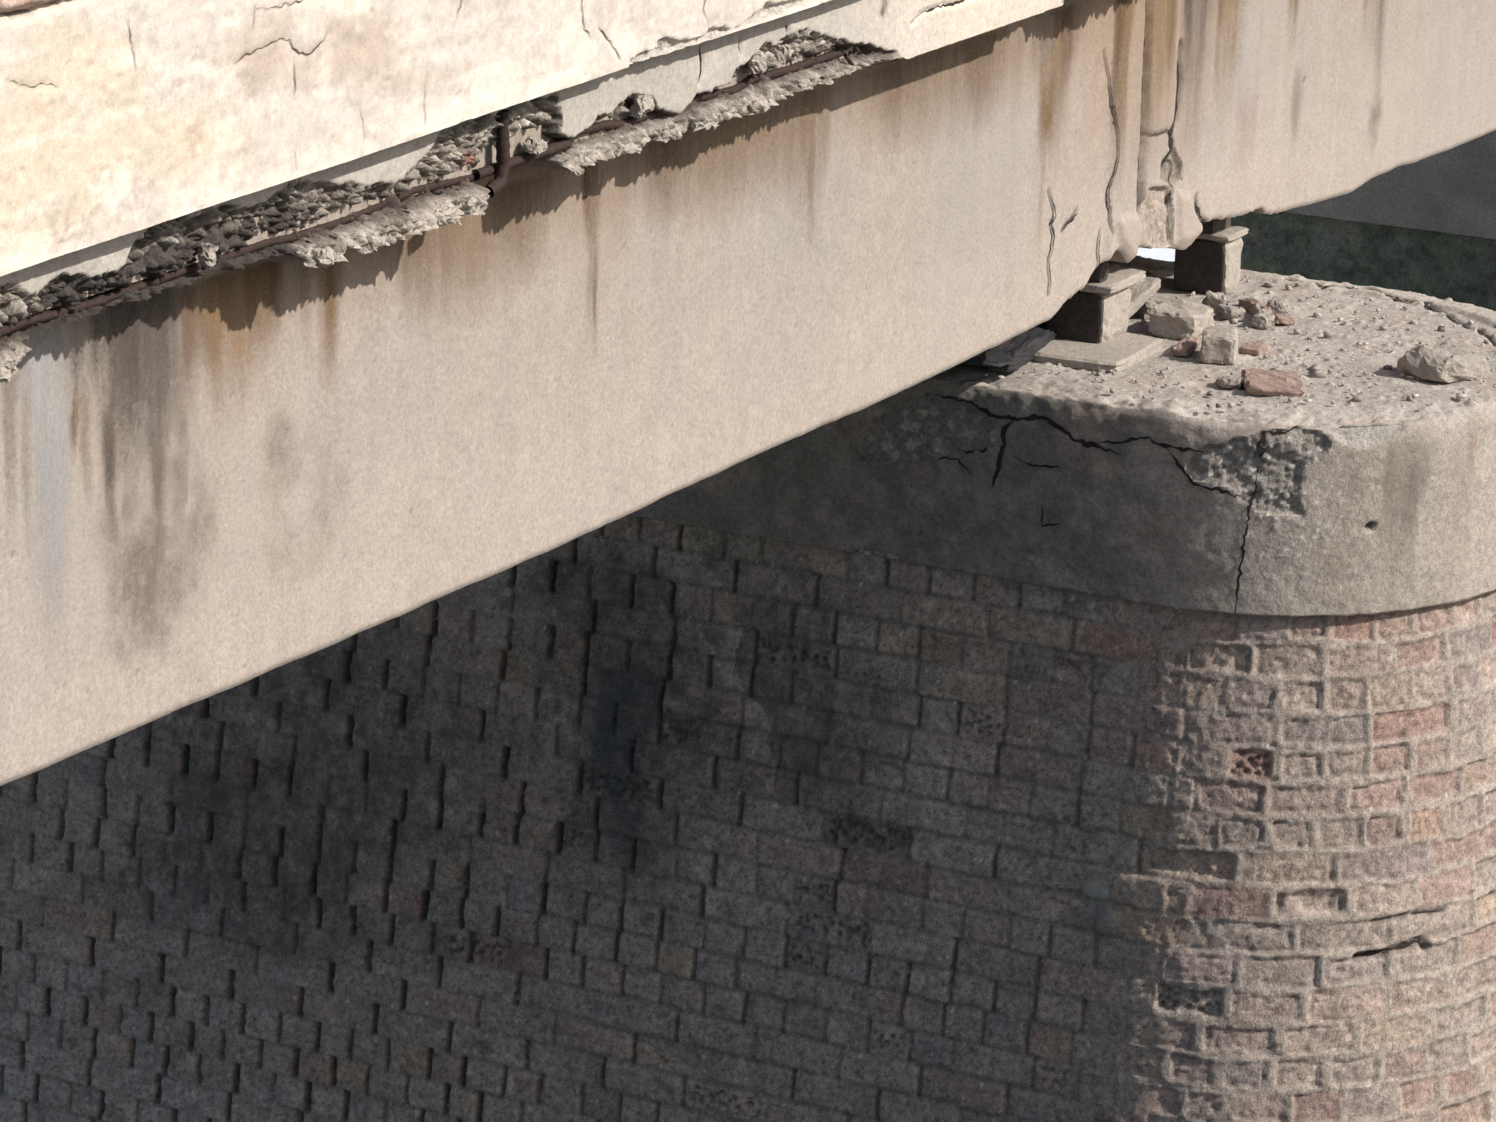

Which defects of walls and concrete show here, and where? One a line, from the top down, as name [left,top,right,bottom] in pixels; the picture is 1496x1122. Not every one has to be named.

crack [236,0,327,92]
spalling [629,0,812,64]
crack [914,0,964,21]
spalling [0,27,902,383]
crack [1049,39,1205,293]
corrosion [188,263,283,358]
corrosion [321,262,340,344]
leakage [95,288,189,488]
leakage [30,341,60,532]
crack [925,393,1297,615]
spalling [1185,425,1407,516]
crack [1354,910,1442,956]